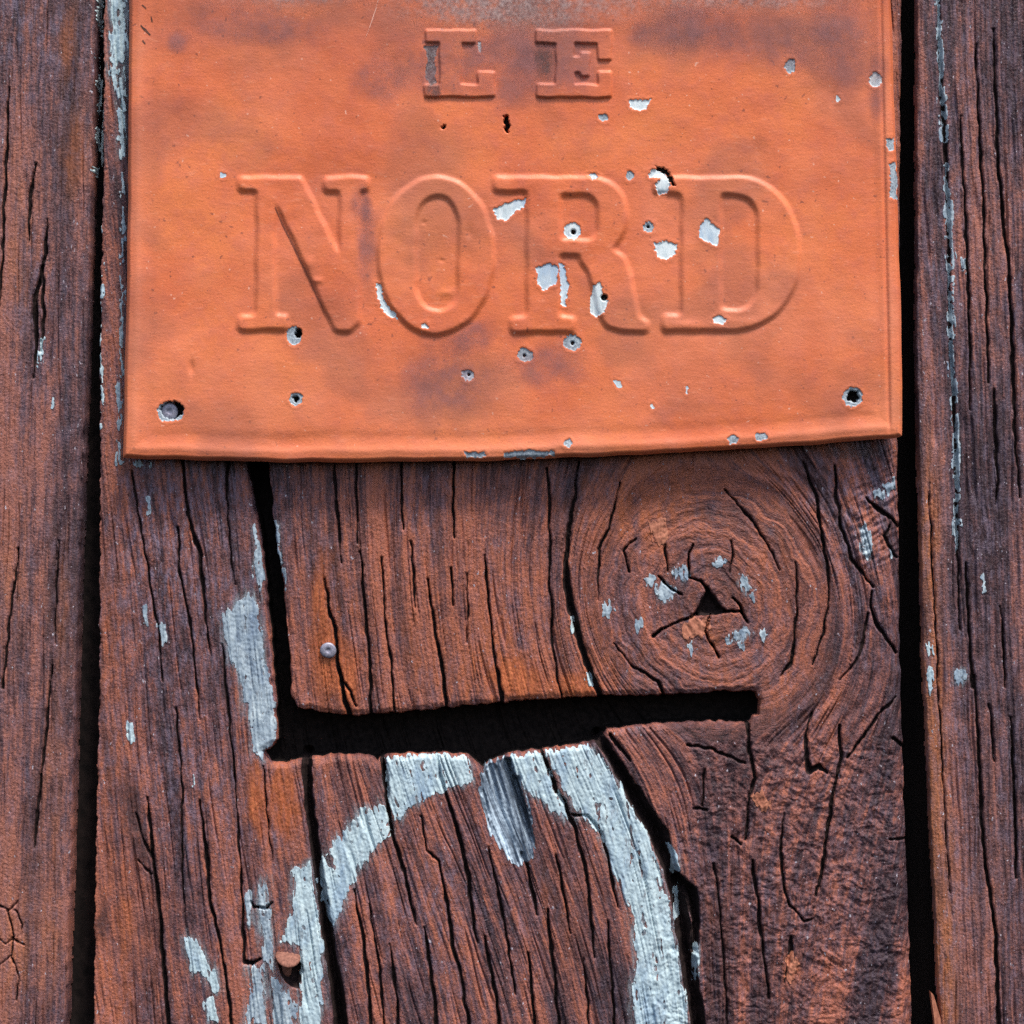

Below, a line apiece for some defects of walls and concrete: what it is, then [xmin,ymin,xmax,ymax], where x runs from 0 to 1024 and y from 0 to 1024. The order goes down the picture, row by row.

crack [0,88,48,379]
peeling [493,198,526,221]
peeling [535,263,569,307]
peeling [590,282,608,317]
peeling [648,169,671,195]
peeling [643,221,677,260]
crack [136,459,273,1024]
peeling [222,523,277,760]
crack [324,463,397,716]
crack [546,461,603,699]
crack [686,697,902,999]
crack [724,462,898,680]